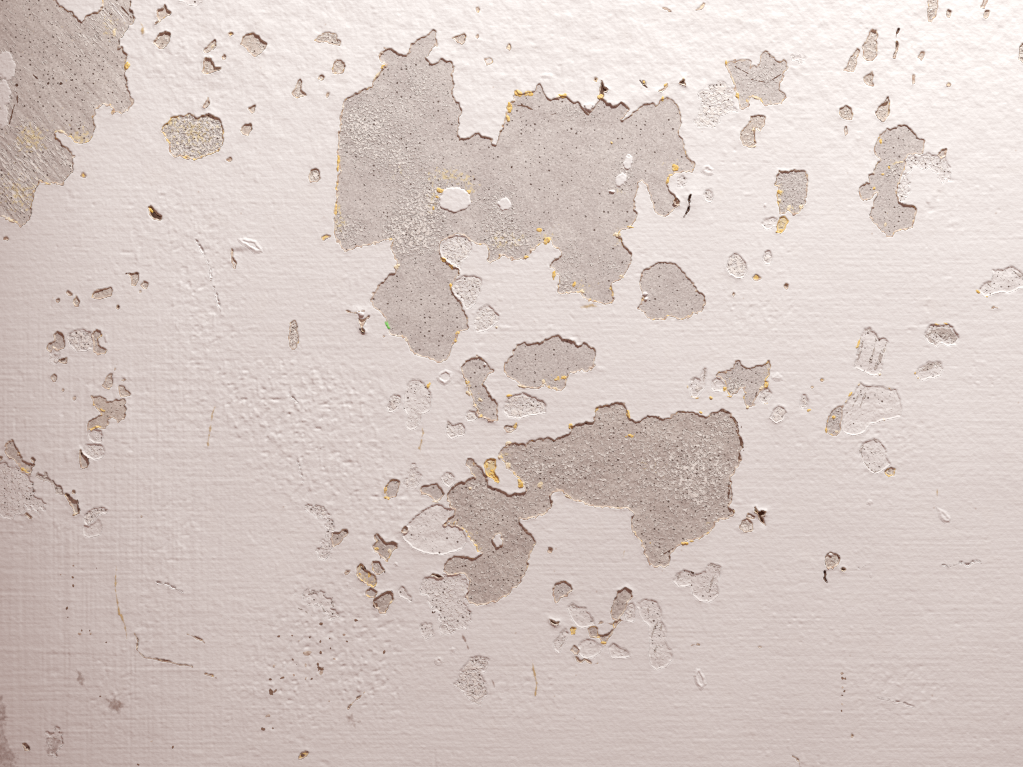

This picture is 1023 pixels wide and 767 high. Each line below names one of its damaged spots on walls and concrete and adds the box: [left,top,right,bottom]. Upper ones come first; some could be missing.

peeling [0,0,135,227]
peeling [161,97,232,162]
peeling [314,29,706,363]
peeling [693,50,806,148]
peeling [761,169,808,233]
peeling [859,96,951,237]
peeling [687,360,787,423]
peeling [825,327,903,477]
spalling [0,439,108,538]
peeling [344,334,766,639]
spalling [269,635,336,695]
peeling [549,581,673,670]